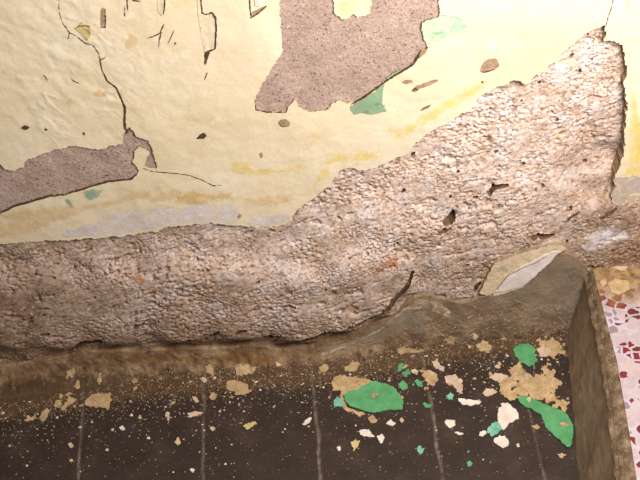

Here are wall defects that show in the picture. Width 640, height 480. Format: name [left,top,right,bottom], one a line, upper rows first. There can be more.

peeling [74,22,91,40]
crack [58,4,129,133]
peeling [157,0,166,15]
peeling [197,0,217,65]
peeling [255,0,440,127]
peeling [0,127,157,214]
crack [143,168,221,187]
flaking render [320,26,640,301]
peeling [470,333,492,353]